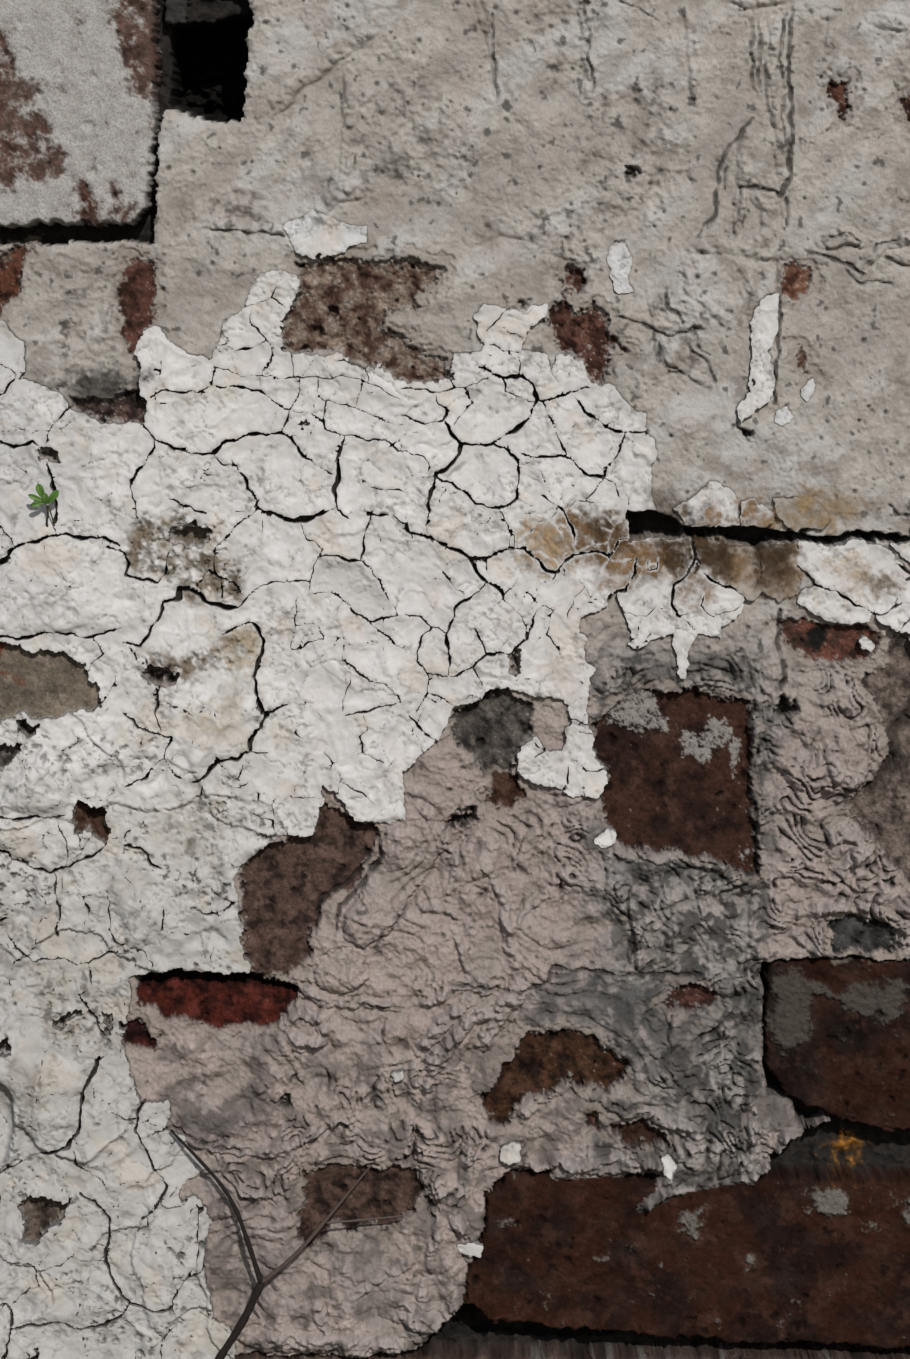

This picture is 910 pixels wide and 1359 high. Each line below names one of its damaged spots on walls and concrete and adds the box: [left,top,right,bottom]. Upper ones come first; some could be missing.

spalling [0,242,34,320]
peeling [117,253,455,453]
peeling [283,209,367,259]
spalling [544,263,631,385]
peeling [729,259,816,442]
crack [697,6,910,407]
crack [0,287,746,835]
crack [797,503,910,623]
peeling [0,300,910,1359]
crack [0,817,165,1162]
crack [447,886,719,999]
crack [94,1203,138,1326]